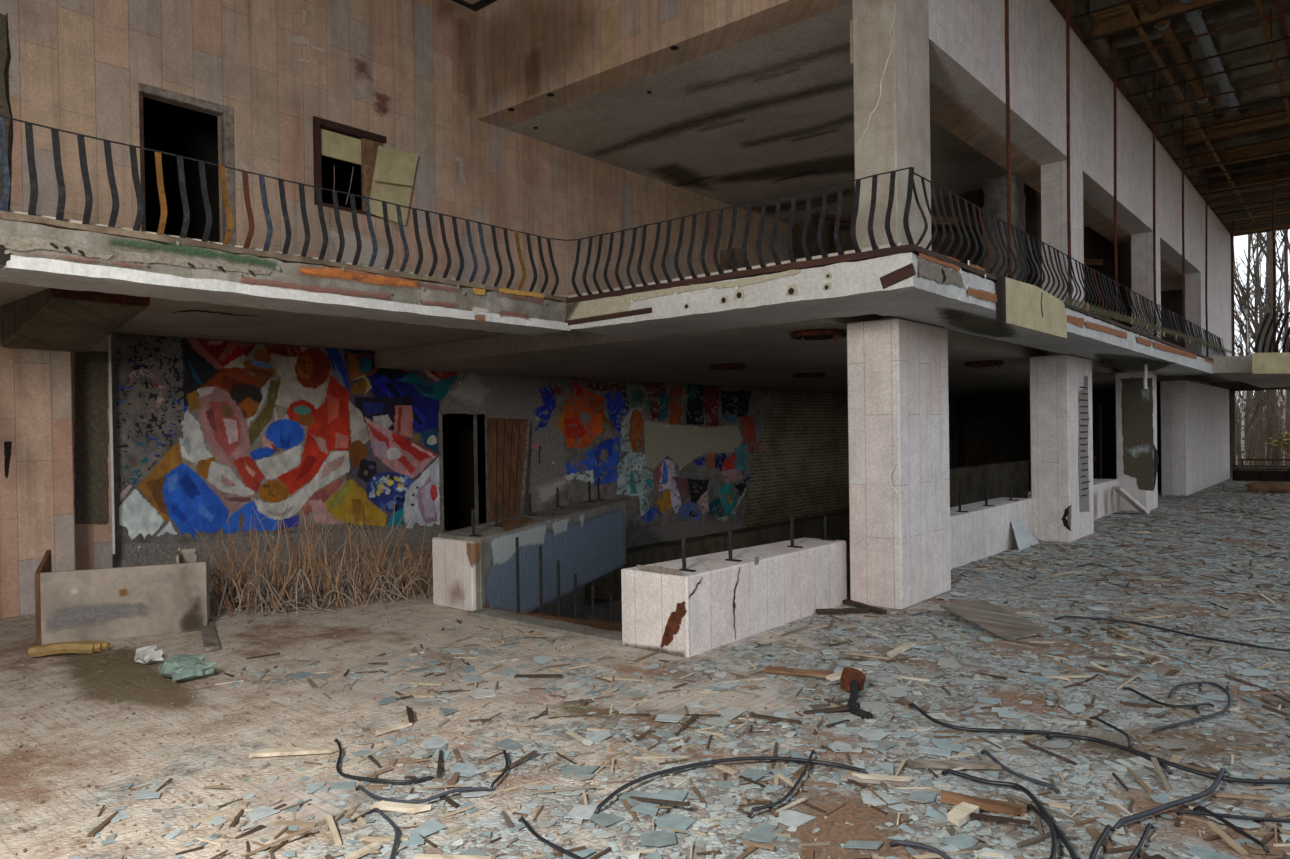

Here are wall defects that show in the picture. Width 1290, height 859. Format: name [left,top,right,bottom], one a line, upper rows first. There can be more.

crack [856,4,896,149]
damp [598,80,854,155]
damp [654,155,855,213]
spalling [0,236,547,320]
peeling [566,269,800,320]
spalling [919,245,997,302]
flaking render [643,389,849,545]
flaking render [948,398,957,468]
peeling [485,509,682,613]
crack [660,577,703,647]
crack [732,567,740,639]